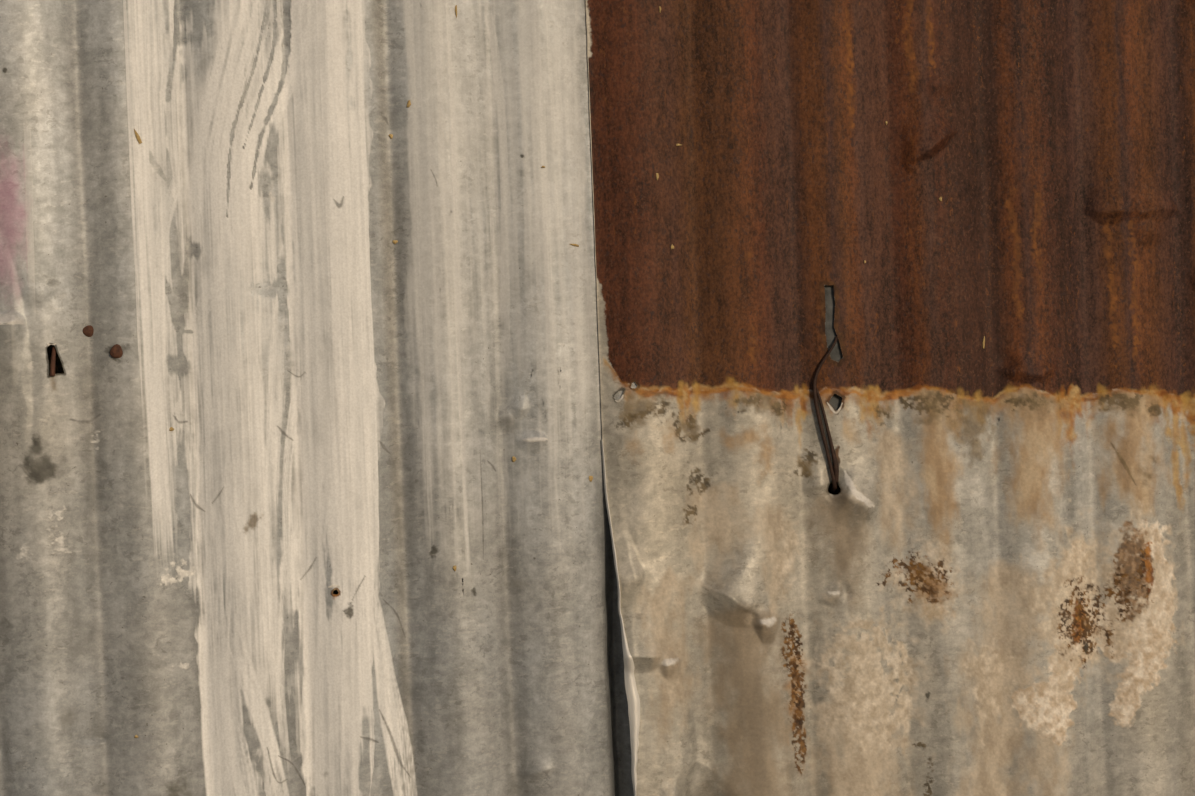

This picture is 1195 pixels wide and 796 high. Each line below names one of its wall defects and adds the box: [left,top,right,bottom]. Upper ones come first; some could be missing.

damp [393,0,605,612]
rust [586,0,1195,537]
rust [780,608,812,781]
damp [612,379,1195,796]
rust [1109,512,1148,607]